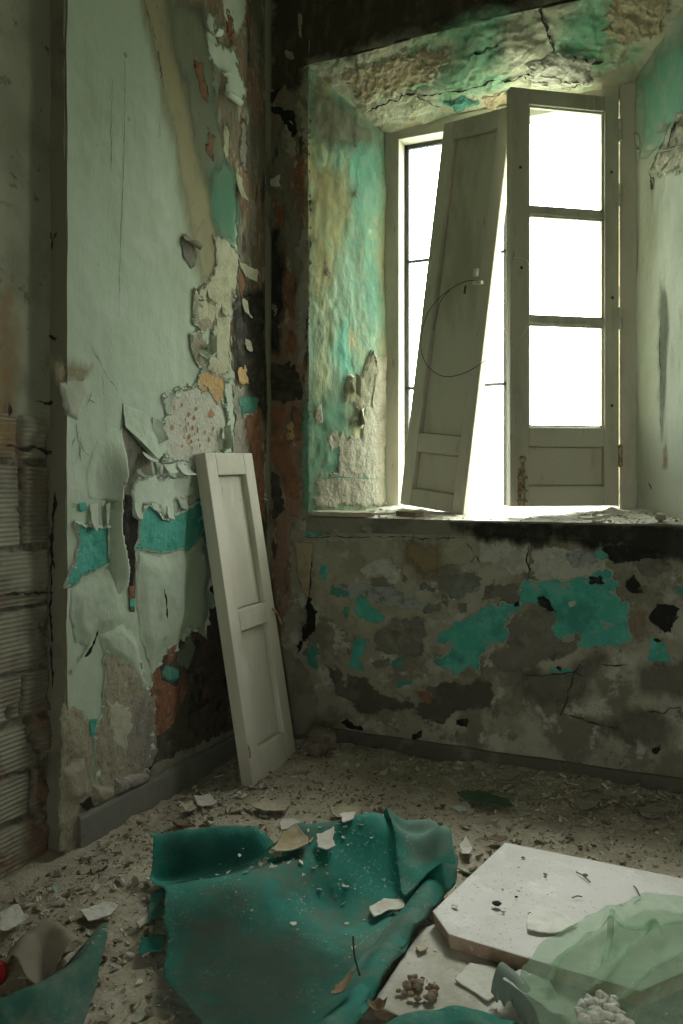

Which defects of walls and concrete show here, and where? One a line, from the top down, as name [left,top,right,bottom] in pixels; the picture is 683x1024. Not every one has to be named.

spalling [342,44,450,110]
crack [367,68,536,113]
spalling [481,91,507,110]
peeling [525,50,597,89]
crack [538,0,604,90]
spalling [602,0,672,46]
spalling [635,110,683,179]
peeling [63,0,388,640]
leakage [232,228,303,424]
peeling [369,568,633,675]
spalling [58,577,233,853]
crack [526,659,681,729]